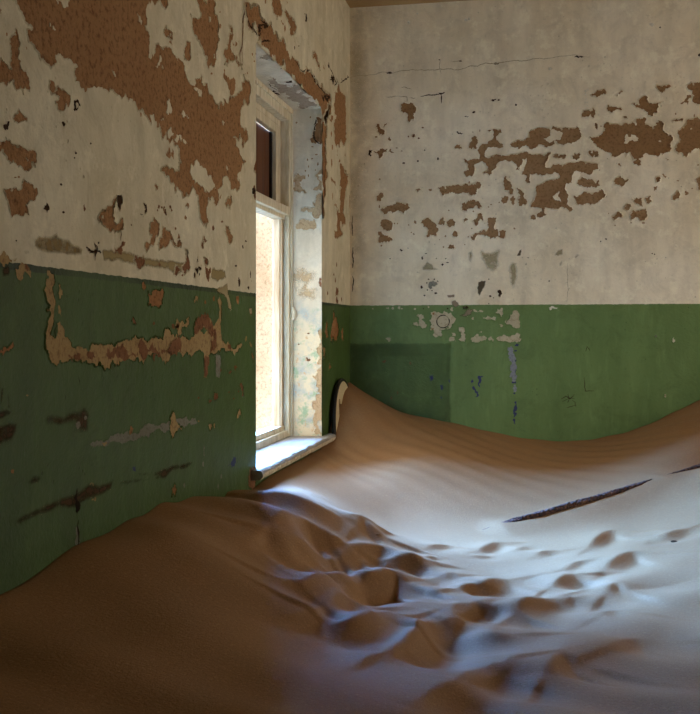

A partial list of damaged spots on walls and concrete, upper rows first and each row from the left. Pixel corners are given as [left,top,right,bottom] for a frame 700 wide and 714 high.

peeling [0,0,251,282]
spalling [243,0,350,240]
peeling [367,122,393,160]
peeling [376,191,411,246]
peeling [400,101,418,124]
crack [296,55,583,209]
peeling [408,80,700,267]
peeling [42,269,254,379]
peeling [412,289,523,372]